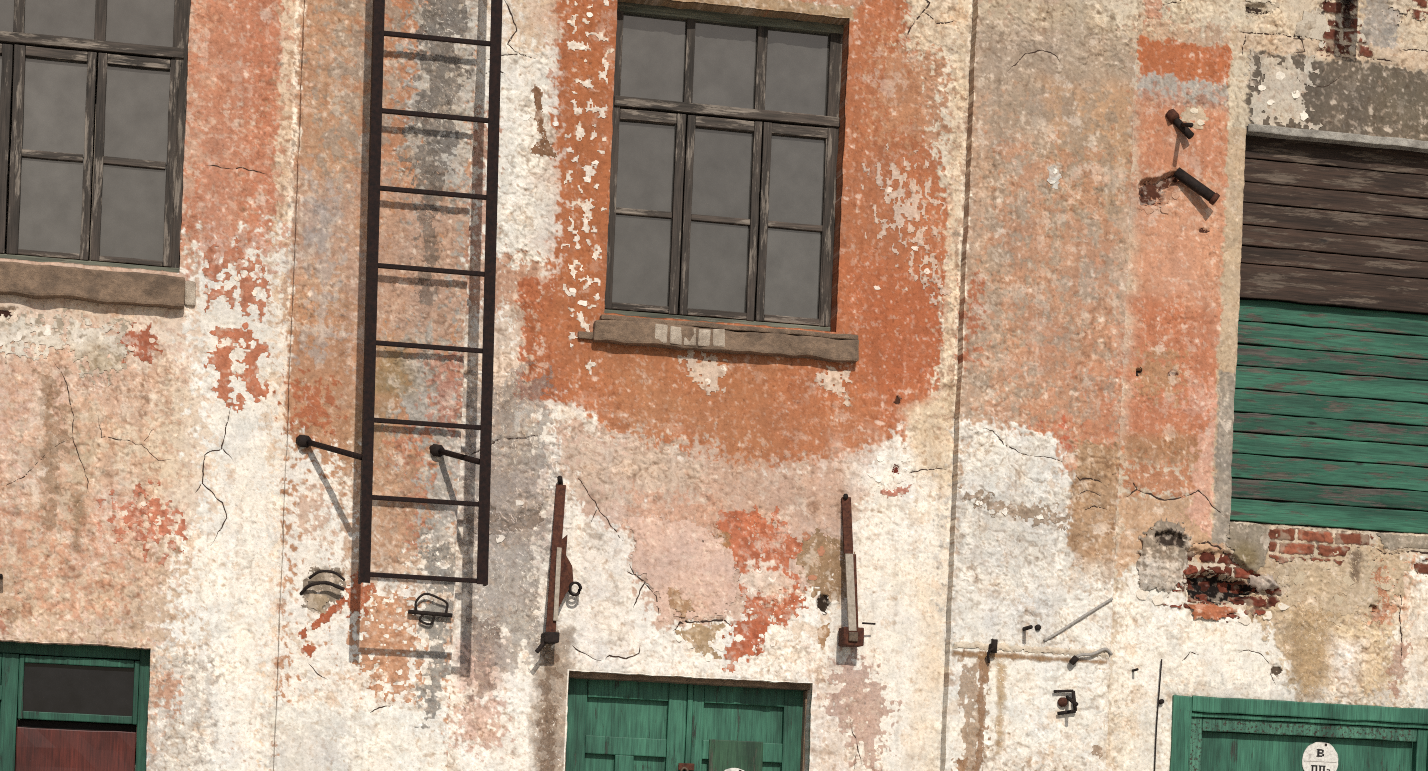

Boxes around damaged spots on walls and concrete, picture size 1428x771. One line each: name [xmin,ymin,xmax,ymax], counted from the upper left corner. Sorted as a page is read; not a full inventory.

crack [906,0,955,38]
peeling [1241,0,1373,130]
flaking render [1382,0,1428,25]
peeling [523,0,614,347]
peeling [861,143,953,305]
peeling [678,350,728,395]
peeling [814,365,852,407]
crack [6,364,231,545]
flaking render [867,447,914,498]
crack [986,428,1234,564]
peeling [675,504,855,673]
flaking render [1136,518,1428,627]